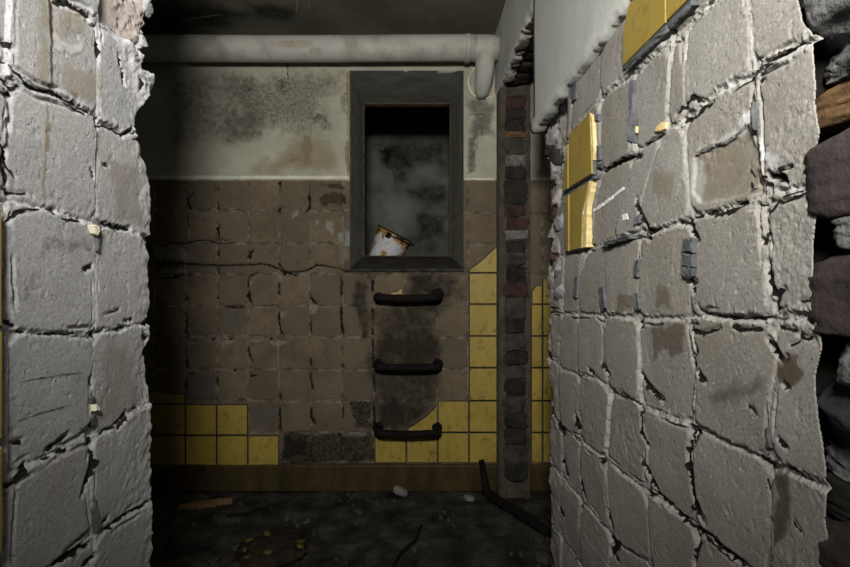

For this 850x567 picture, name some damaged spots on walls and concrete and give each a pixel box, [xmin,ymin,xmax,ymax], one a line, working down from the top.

crack [0,42,132,136]
crack [51,0,144,90]
spalling [98,0,153,49]
spalling [143,69,155,91]
crack [0,143,80,223]
flaking render [501,13,533,482]
spalling [543,123,564,301]
crack [680,188,814,383]
leakage [281,271,455,463]
leakage [653,324,683,356]
crack [4,406,136,495]
crack [639,372,748,566]